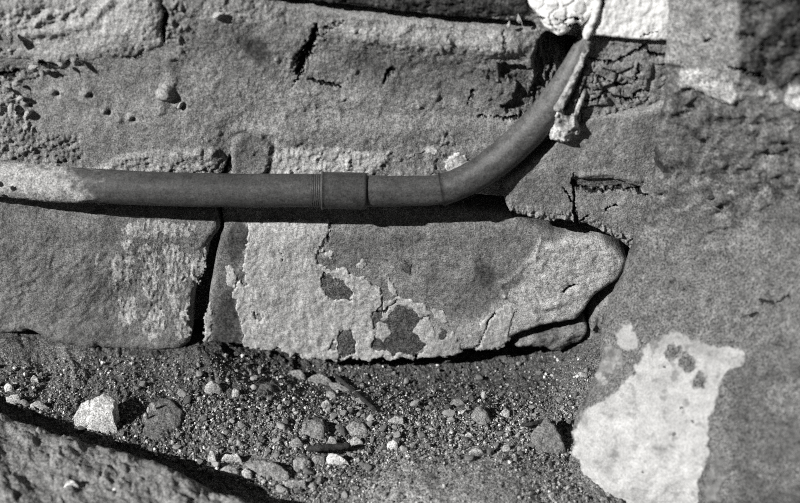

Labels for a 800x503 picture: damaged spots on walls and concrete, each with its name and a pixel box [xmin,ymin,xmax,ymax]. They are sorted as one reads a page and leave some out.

crack [294,21,341,88]
crack [585,31,665,114]
crack [562,172,648,224]
peeling [203,301,213,343]
peeling [225,218,462,362]
peeling [475,304,517,351]